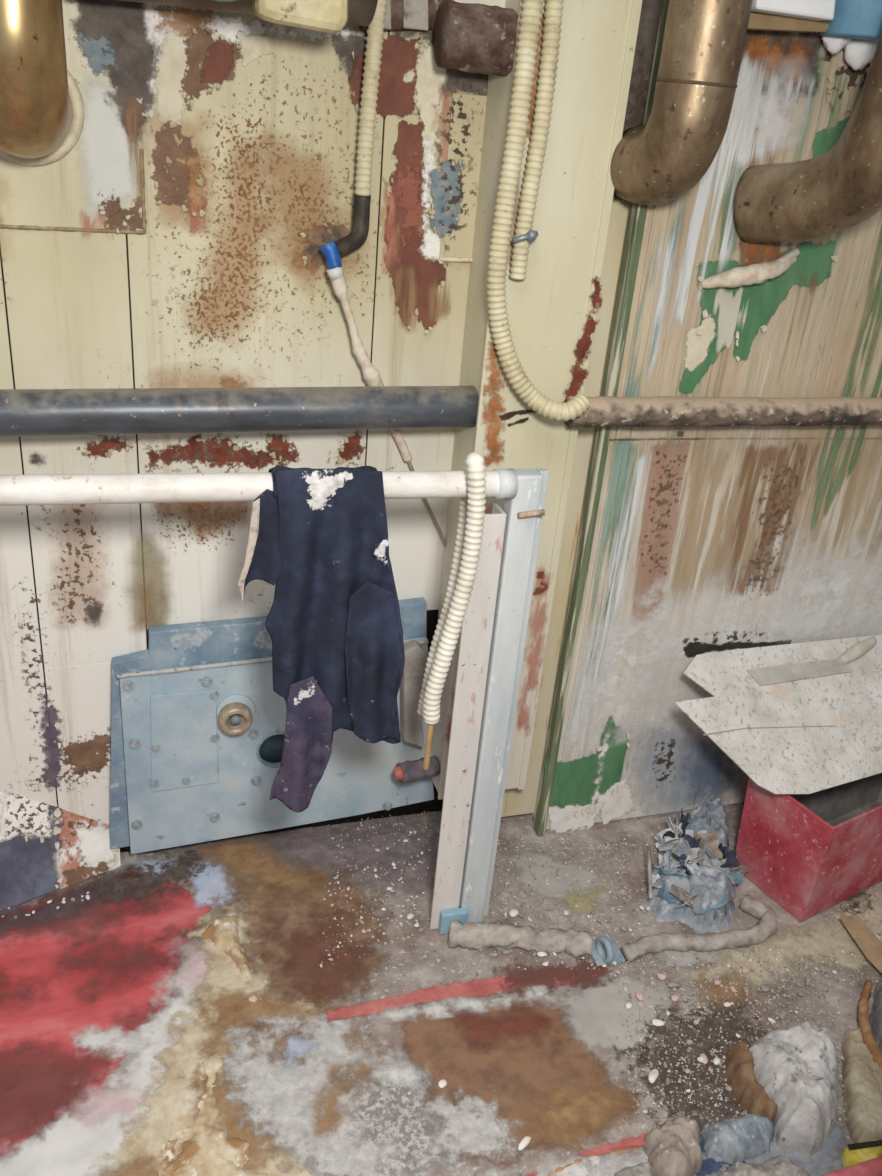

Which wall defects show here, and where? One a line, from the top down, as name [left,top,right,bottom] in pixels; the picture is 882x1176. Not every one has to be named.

peeling [136,3,367,126]
rust [84,65,371,388]
spalling [293,219,350,273]
peeling [376,33,475,334]
rust [563,276,602,403]
peeling [679,156,837,394]
rust [40,504,103,623]
rust [155,502,247,549]
rust [633,440,689,624]
rust [21,588,50,726]
peeling [0,694,117,911]
peeling [544,716,637,833]